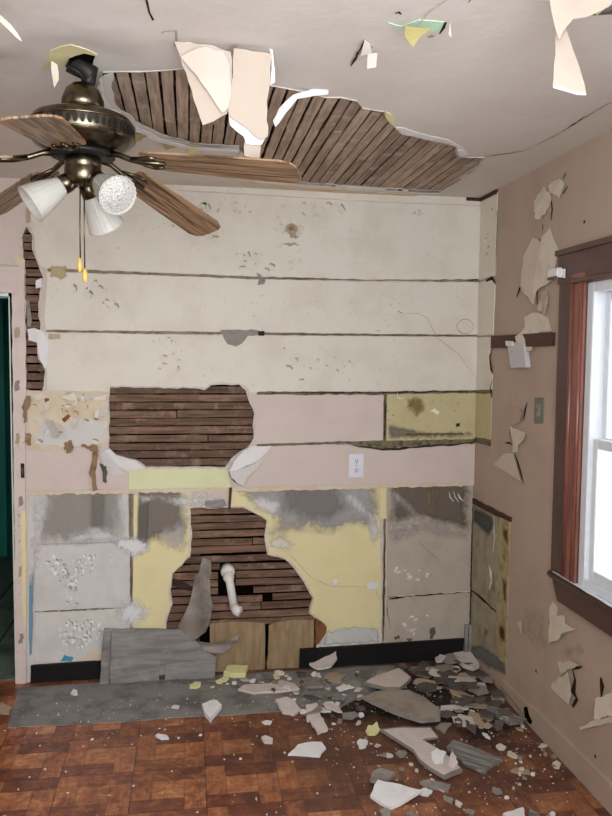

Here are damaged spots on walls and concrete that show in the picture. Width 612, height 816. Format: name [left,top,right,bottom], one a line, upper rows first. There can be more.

crack [145,0,177,46]
peeling [351,40,377,69]
peeling [388,20,452,47]
spalling [100,68,486,270]
spalling [12,226,327,688]